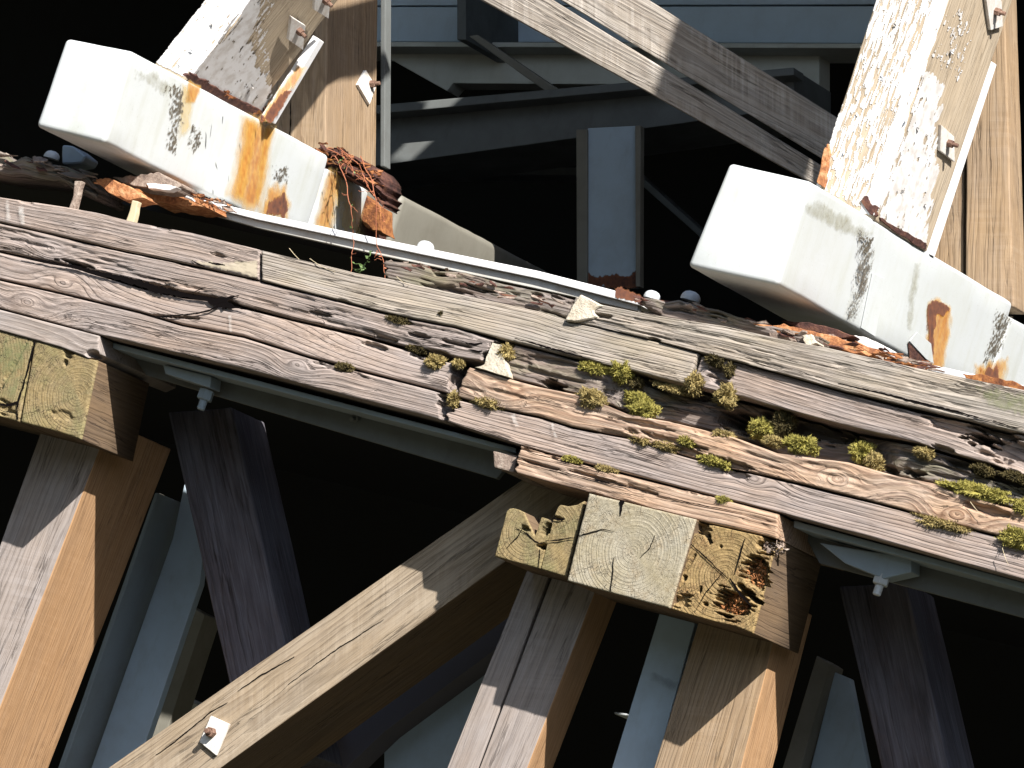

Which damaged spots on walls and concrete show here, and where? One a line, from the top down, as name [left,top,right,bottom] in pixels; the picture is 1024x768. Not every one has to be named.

peeling [157,0,274,111]
corrosion [182,66,302,218]
peeling [816,0,971,243]
corrosion [861,196,927,250]
corrosion [588,271,641,302]
corrosion [774,299,950,368]
corrosion [961,362,1024,390]